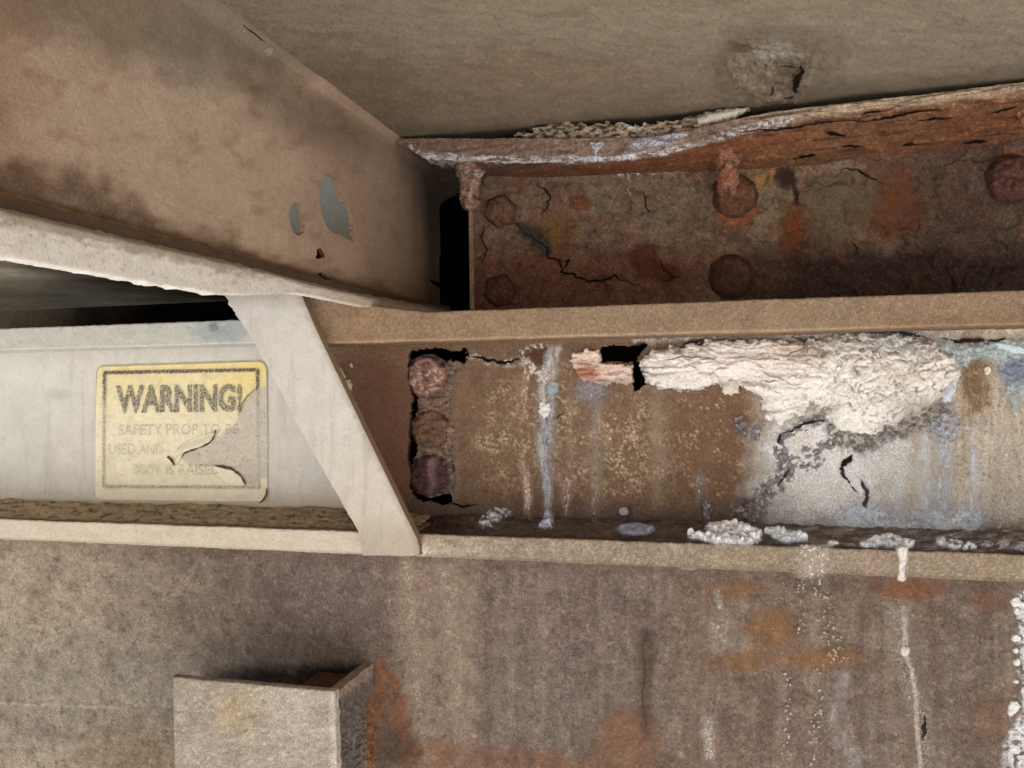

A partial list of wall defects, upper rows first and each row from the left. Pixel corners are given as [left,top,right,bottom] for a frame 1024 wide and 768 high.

spalling [717,30,837,108]
corrosion [513,107,750,139]
corrosion [751,169,777,190]
crack [742,109,953,184]
crack [517,185,683,286]
spalling [520,343,634,403]
efflorescence [521,348,570,526]
crack [777,420,826,444]
leakage [618,506,654,534]
crack [839,455,873,520]
efflorescence [886,595,936,768]
efflorescence [1003,592,1024,768]